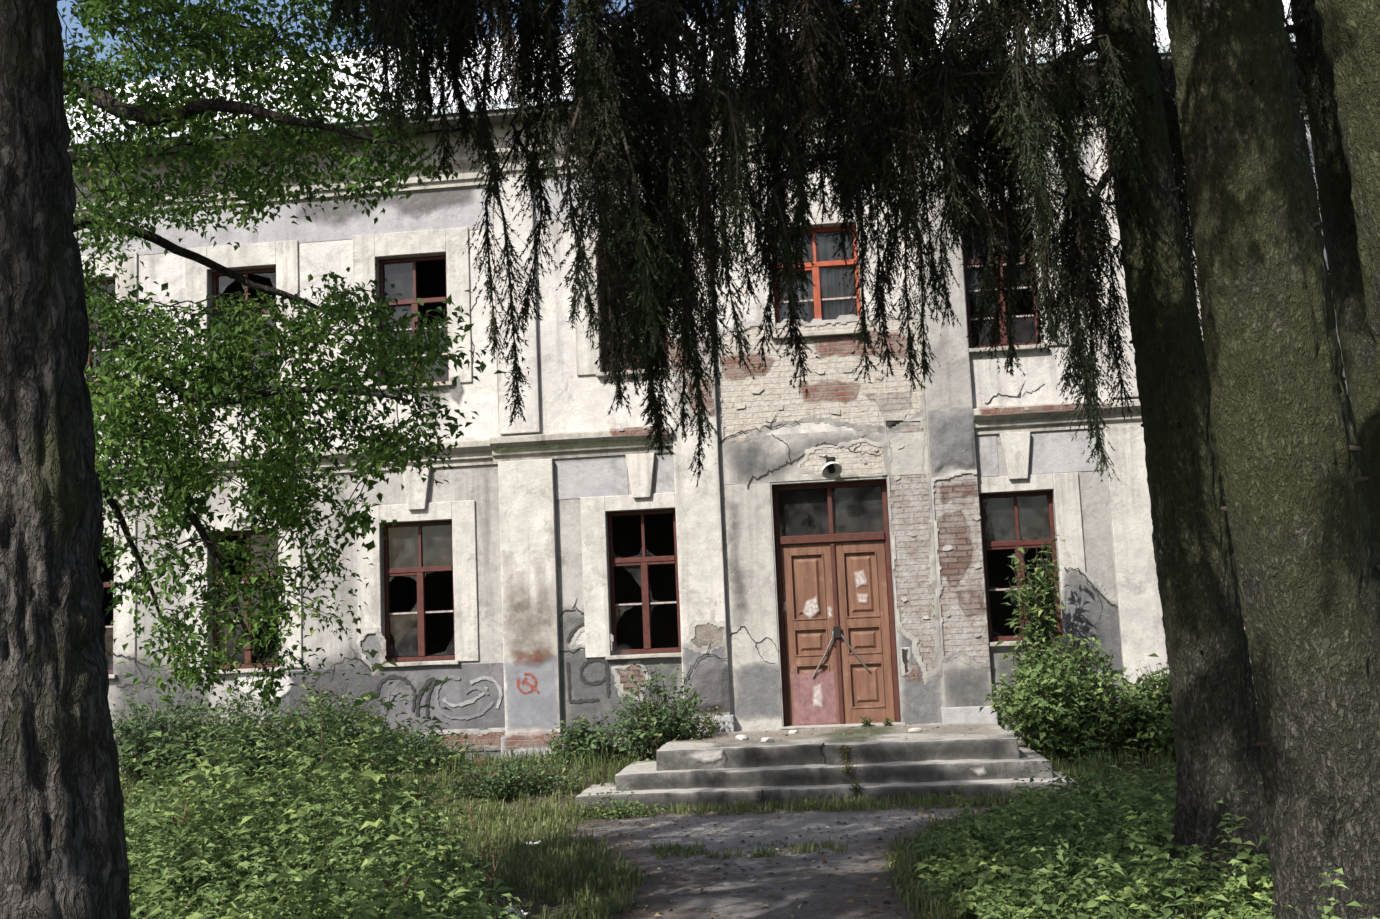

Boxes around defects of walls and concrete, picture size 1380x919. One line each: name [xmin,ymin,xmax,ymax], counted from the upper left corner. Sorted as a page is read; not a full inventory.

crack [719,412,881,489]
spalling [669,310,990,724]
crack [683,626,780,683]
peeling [1059,570,1124,705]